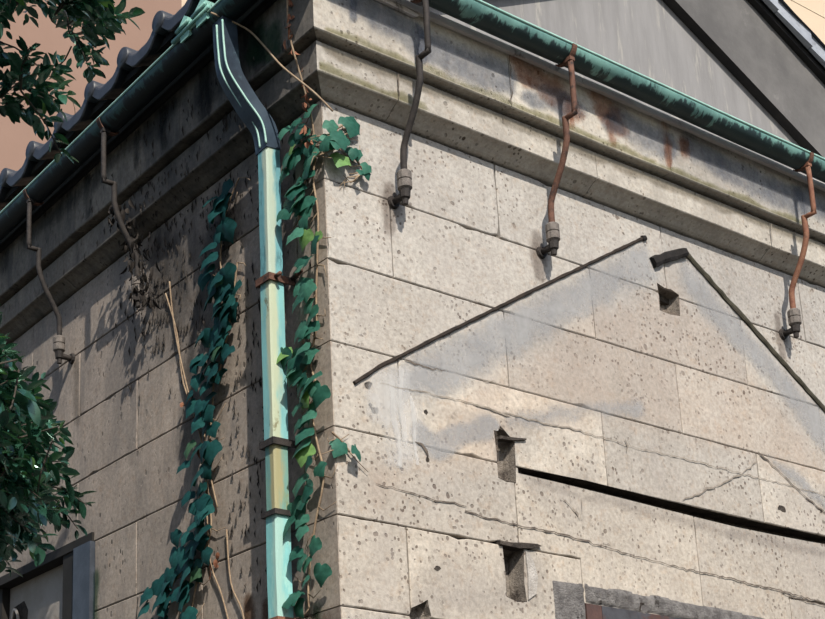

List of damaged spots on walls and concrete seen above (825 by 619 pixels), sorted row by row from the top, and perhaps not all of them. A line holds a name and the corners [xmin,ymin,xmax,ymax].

leakage [370,246,655,467]
crack [380,383,825,512]
crack [376,483,825,606]